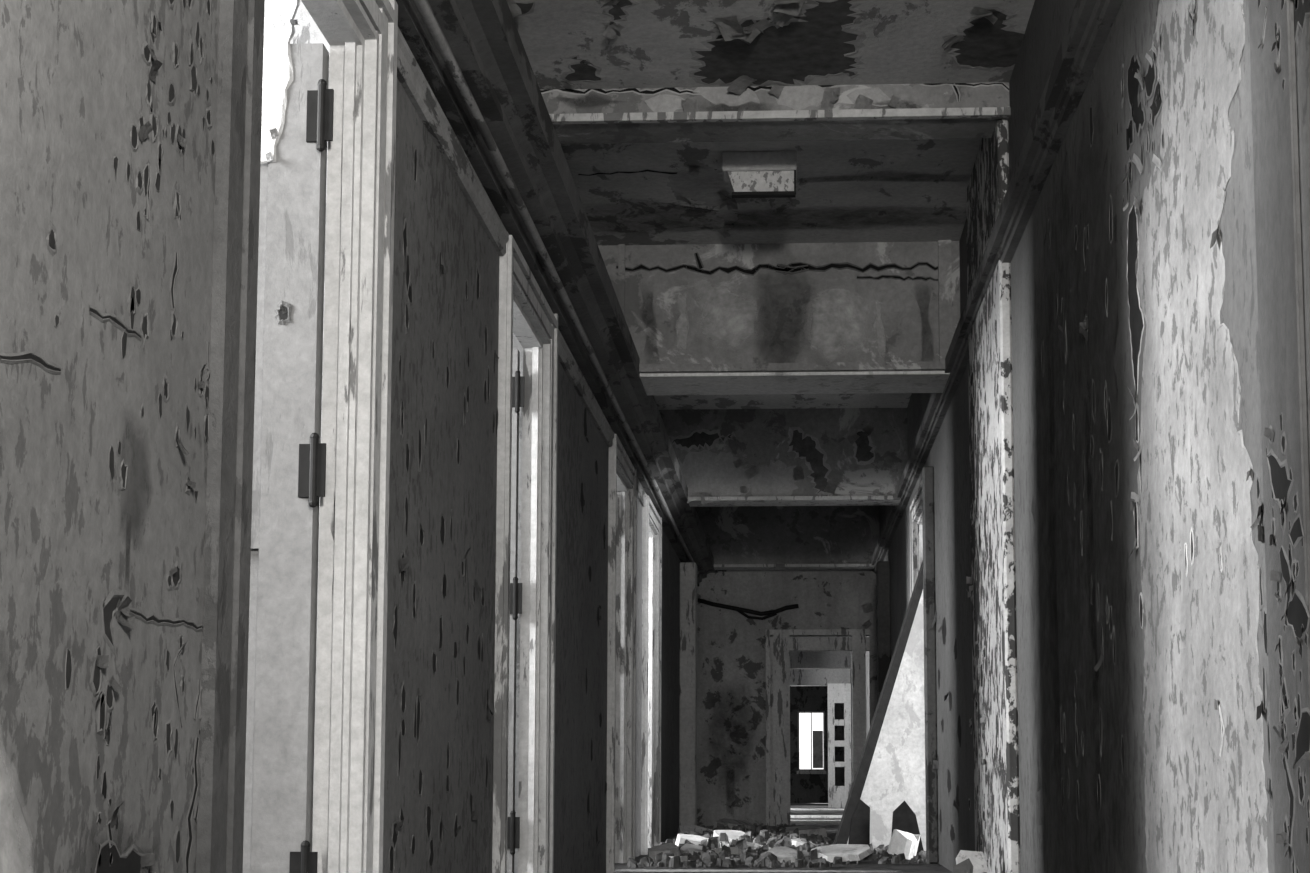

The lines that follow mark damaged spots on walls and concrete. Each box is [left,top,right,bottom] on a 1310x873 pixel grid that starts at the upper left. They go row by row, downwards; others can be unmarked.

spalling [507,0,535,17]
spalling [601,0,640,39]
spalling [560,54,606,86]
peeling [645,0,900,112]
peeling [942,7,1025,72]
crack [616,252,938,281]
spalling [671,429,736,452]
peeling [1060,0,1310,873]
spalling [787,427,839,496]